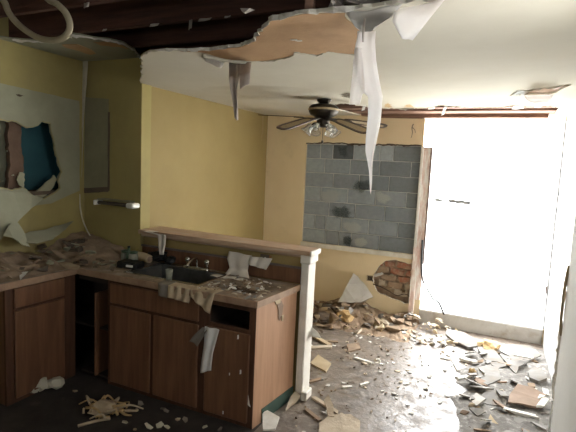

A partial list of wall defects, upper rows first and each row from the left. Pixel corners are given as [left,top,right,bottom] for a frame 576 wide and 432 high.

peeling [198,13,359,62]
peeling [0,32,141,206]
flaking render [373,260,412,304]